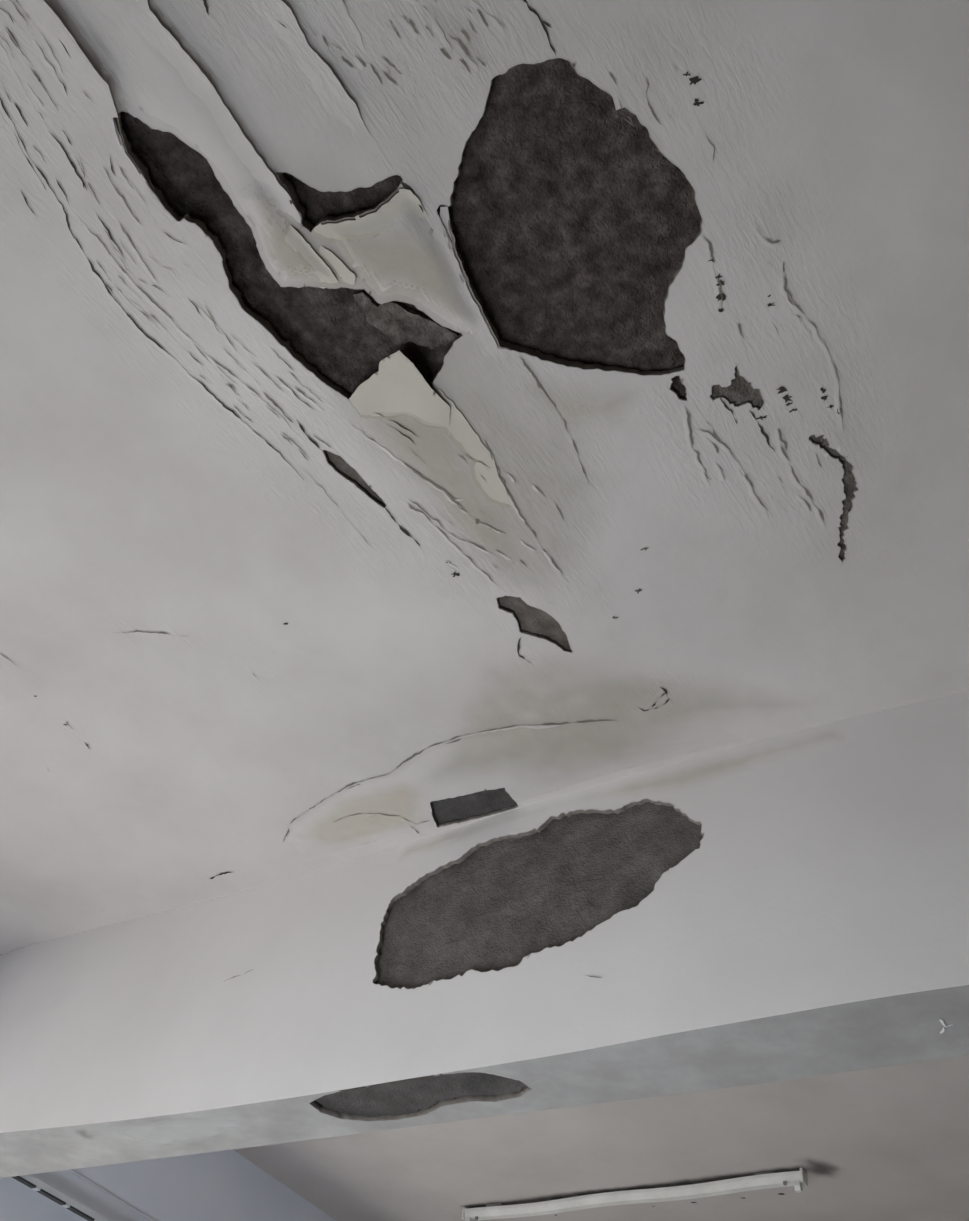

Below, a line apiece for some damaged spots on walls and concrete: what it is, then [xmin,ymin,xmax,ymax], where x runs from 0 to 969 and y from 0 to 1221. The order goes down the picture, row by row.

spalling [13,0,704,509]
peeling [710,365,766,420]
crack [681,227,859,562]
spalling [776,386,797,413]
spalling [496,596,572,653]
spalling [430,788,518,828]
spalling [372,798,704,990]
spalling [309,1072,532,1122]